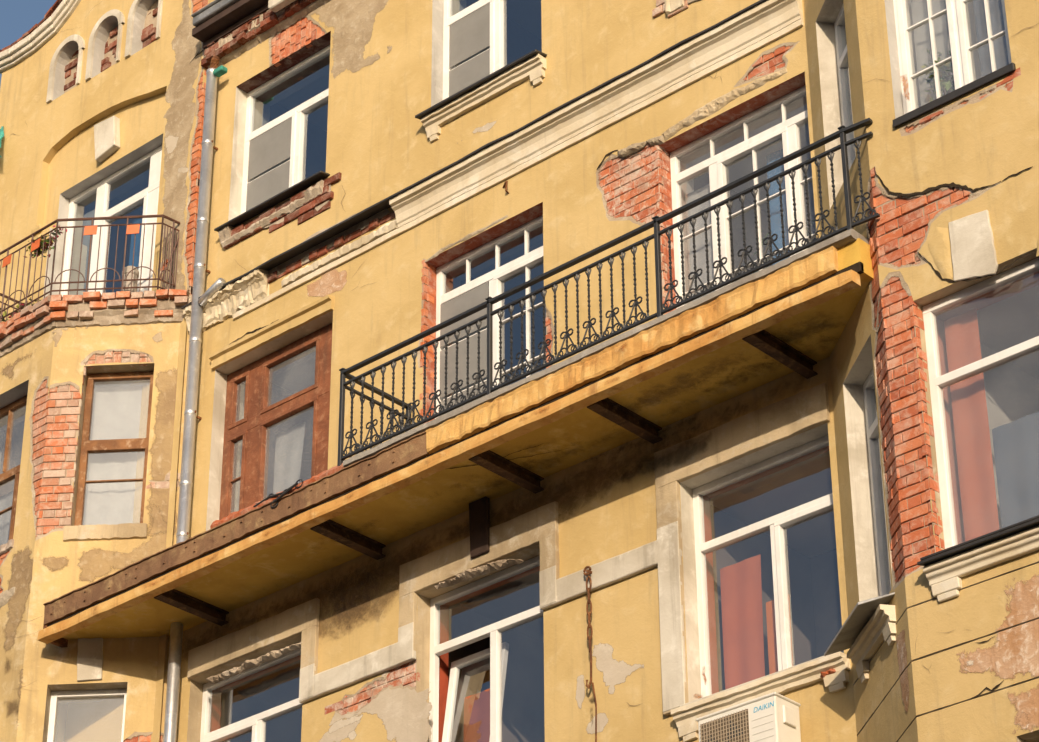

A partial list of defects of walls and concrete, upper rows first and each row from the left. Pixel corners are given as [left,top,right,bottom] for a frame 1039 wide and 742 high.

peeling [269,0,392,78]
flaking render [596,41,800,314]
crack [874,166,1033,196]
crack [918,252,1034,282]
flaking render [29,349,154,541]
leakage [490,440,706,527]
leakage [187,547,427,654]
peeling [319,658,432,742]
peeling [576,675,585,709]
peeling [586,713,608,734]
peeling [592,643,644,694]
peeling [957,574,1039,734]